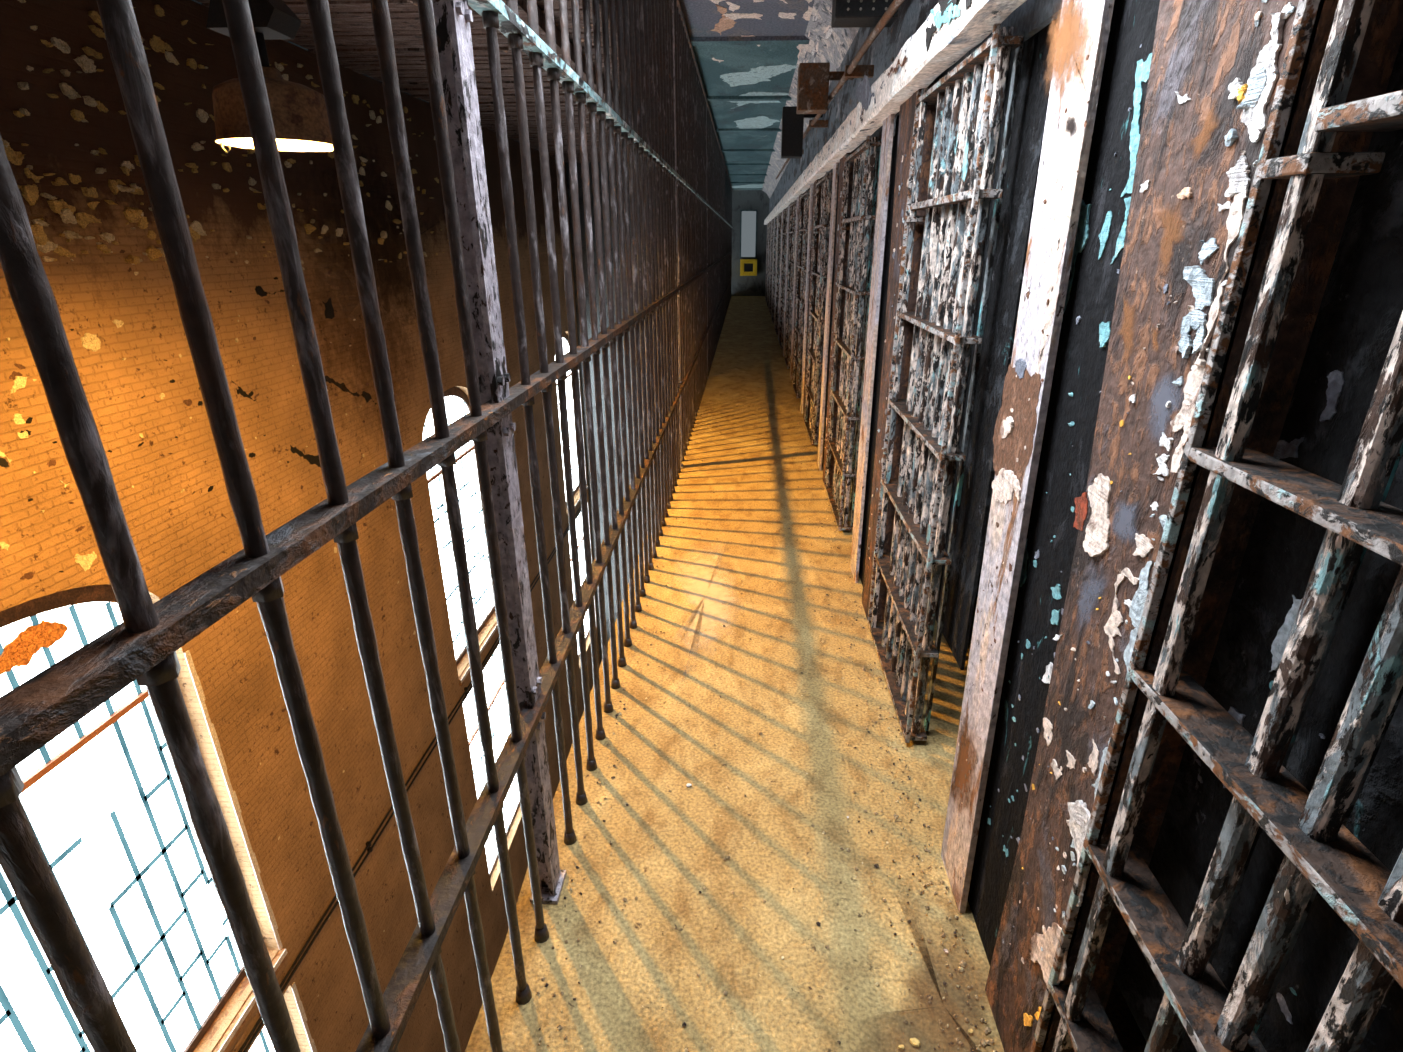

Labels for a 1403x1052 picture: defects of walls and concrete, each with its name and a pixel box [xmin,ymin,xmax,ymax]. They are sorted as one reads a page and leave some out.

peeling [17,11,126,122]
peeling [141,20,213,105]
peeling [710,0,833,129]
peeling [2,139,167,276]
peeling [175,141,266,210]
peeling [343,92,449,262]
rust [1195,113,1215,152]
rust [1121,304,1133,351]
spalling [992,356,1044,504]
peeling [983,535,1056,591]
peeling [1015,473,1167,985]
peeling [1023,1007,1041,1027]